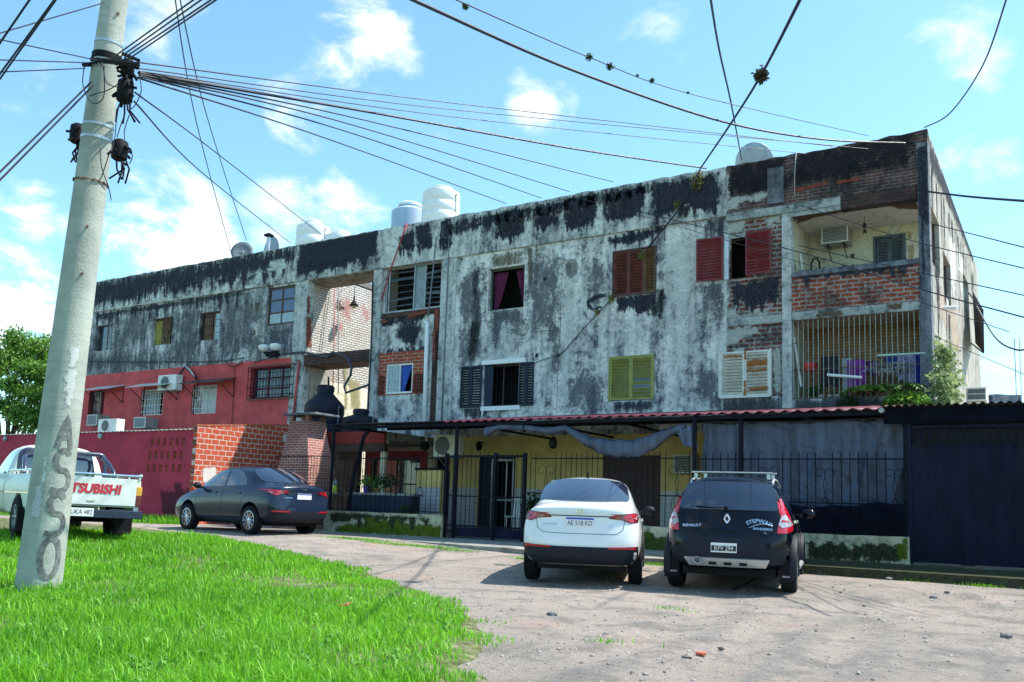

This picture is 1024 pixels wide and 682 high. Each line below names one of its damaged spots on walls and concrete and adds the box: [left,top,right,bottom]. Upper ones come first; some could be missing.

damp [87,231,378,375]
damp [382,315,426,353]
damp [398,133,974,416]
flaking render [717,173,782,352]
damp [330,512,429,530]